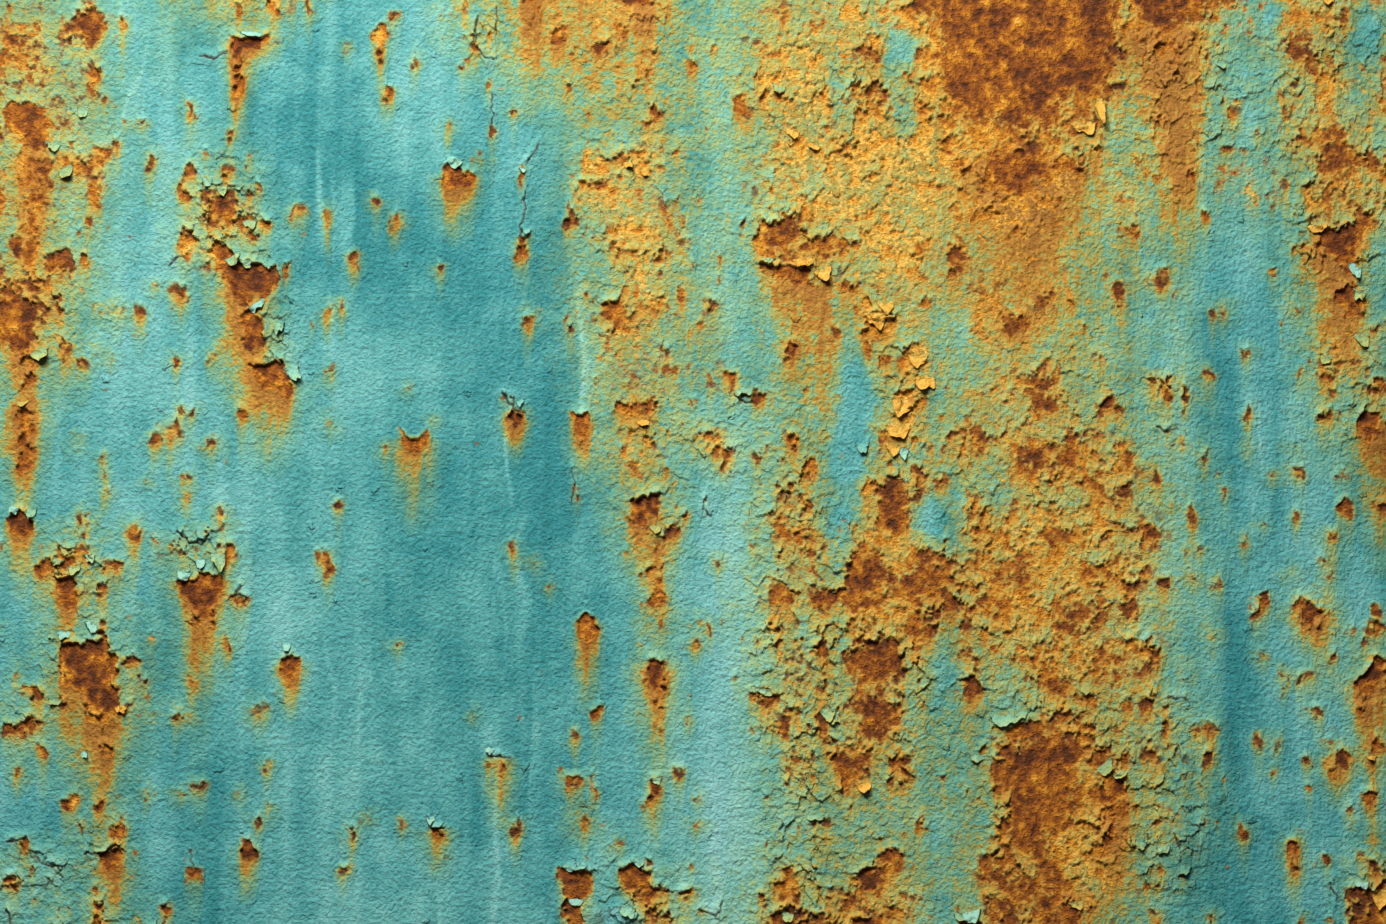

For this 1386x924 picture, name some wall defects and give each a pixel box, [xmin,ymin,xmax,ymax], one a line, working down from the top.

corrosion [0,0,417,905]
spalling [146,223,321,477]
spalling [720,212,952,465]
corrosion [330,0,1386,924]
corrosion [0,844,205,924]